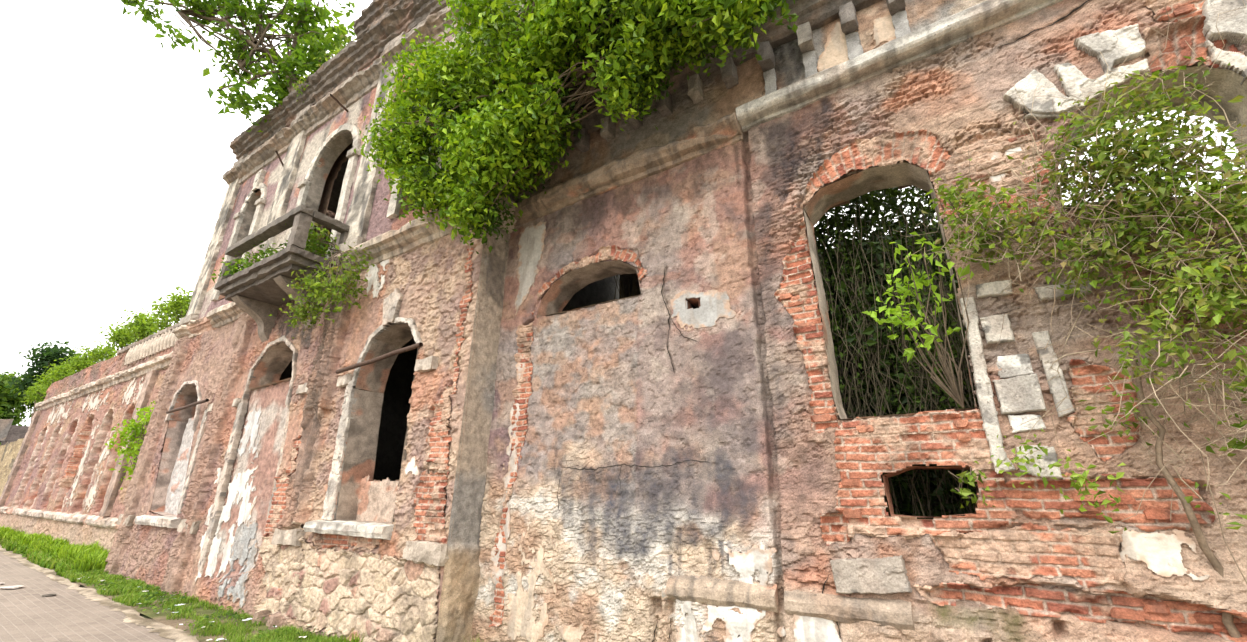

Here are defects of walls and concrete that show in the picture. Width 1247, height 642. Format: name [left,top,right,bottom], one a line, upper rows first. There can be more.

spalling [1141,0,1245,74]
peeling [365,259,393,304]
crack [661,269,699,371]
spalling [404,246,474,544]
spalling [774,127,1247,642]
spalling [195,404,440,642]
peeling [662,581,766,642]